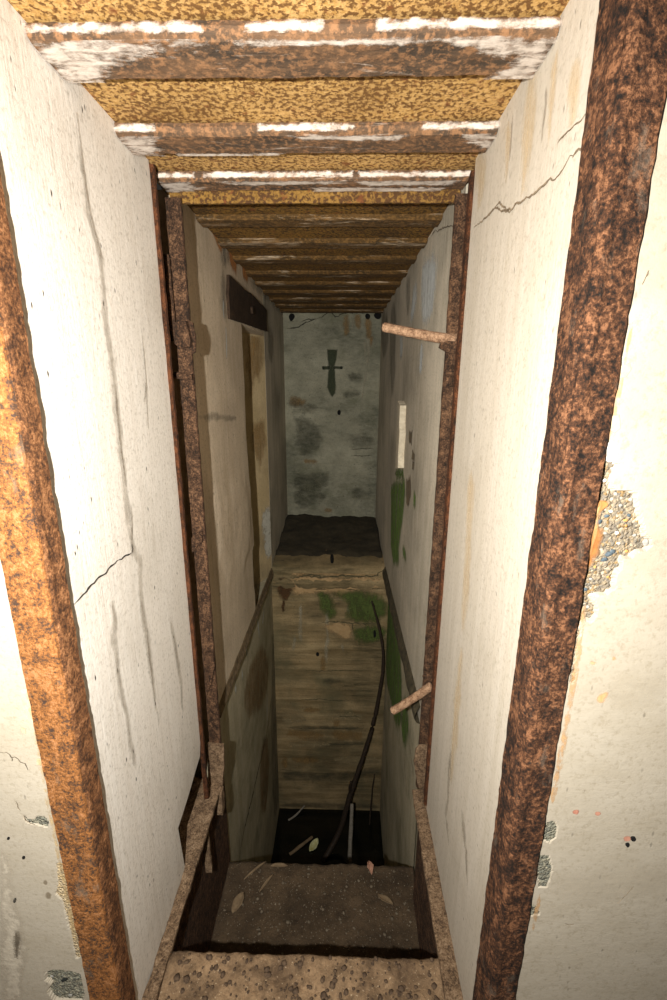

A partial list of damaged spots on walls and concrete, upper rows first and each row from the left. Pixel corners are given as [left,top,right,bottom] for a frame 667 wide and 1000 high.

crack [432,113,586,234]
crack [74,514,133,604]
rust [587,501,608,567]
spalling [578,462,649,621]
spalling [543,821,557,842]
spalling [537,855,551,887]
spalling [47,970,85,999]